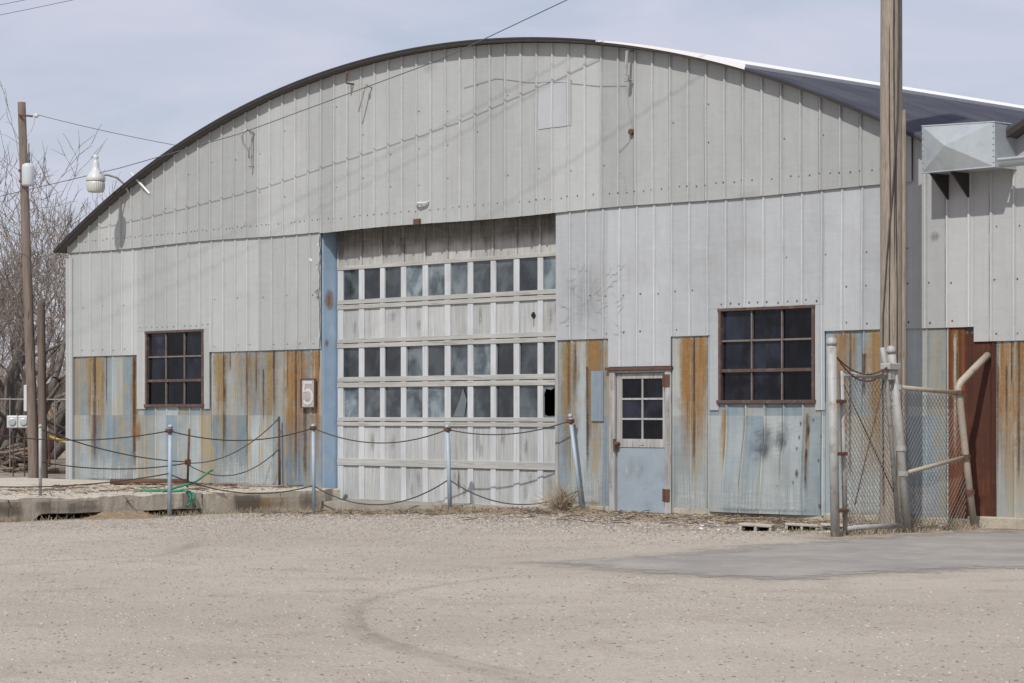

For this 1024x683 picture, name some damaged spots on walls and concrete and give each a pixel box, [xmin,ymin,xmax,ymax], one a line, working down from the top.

corrosion [88,356,107,455]
corrosion [214,353,231,443]
corrosion [245,341,327,466]
corrosion [564,339,600,455]
corrosion [682,336,707,456]
corrosion [953,329,961,420]
corrosion [997,341,1024,469]